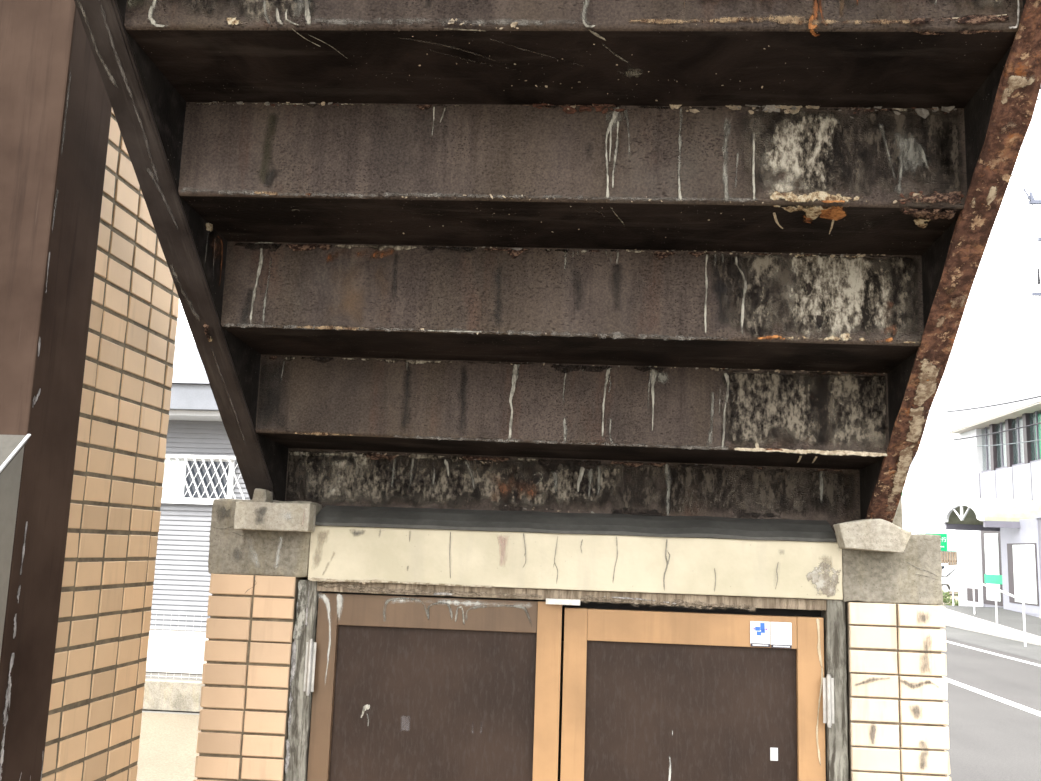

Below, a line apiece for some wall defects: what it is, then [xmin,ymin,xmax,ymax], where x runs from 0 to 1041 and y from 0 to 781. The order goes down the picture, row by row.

water stain [130,0,166,27]
water stain [226,0,345,57]
rust [808,0,827,36]
rust [910,14,1009,35]
water stain [605,107,630,199]
water stain [880,125,928,191]
rust [893,191,965,228]
water stain [509,364,520,439]
water stain [602,367,612,443]
water stain [648,369,668,430]
crack [662,540,670,589]
flaking render [806,559,841,597]